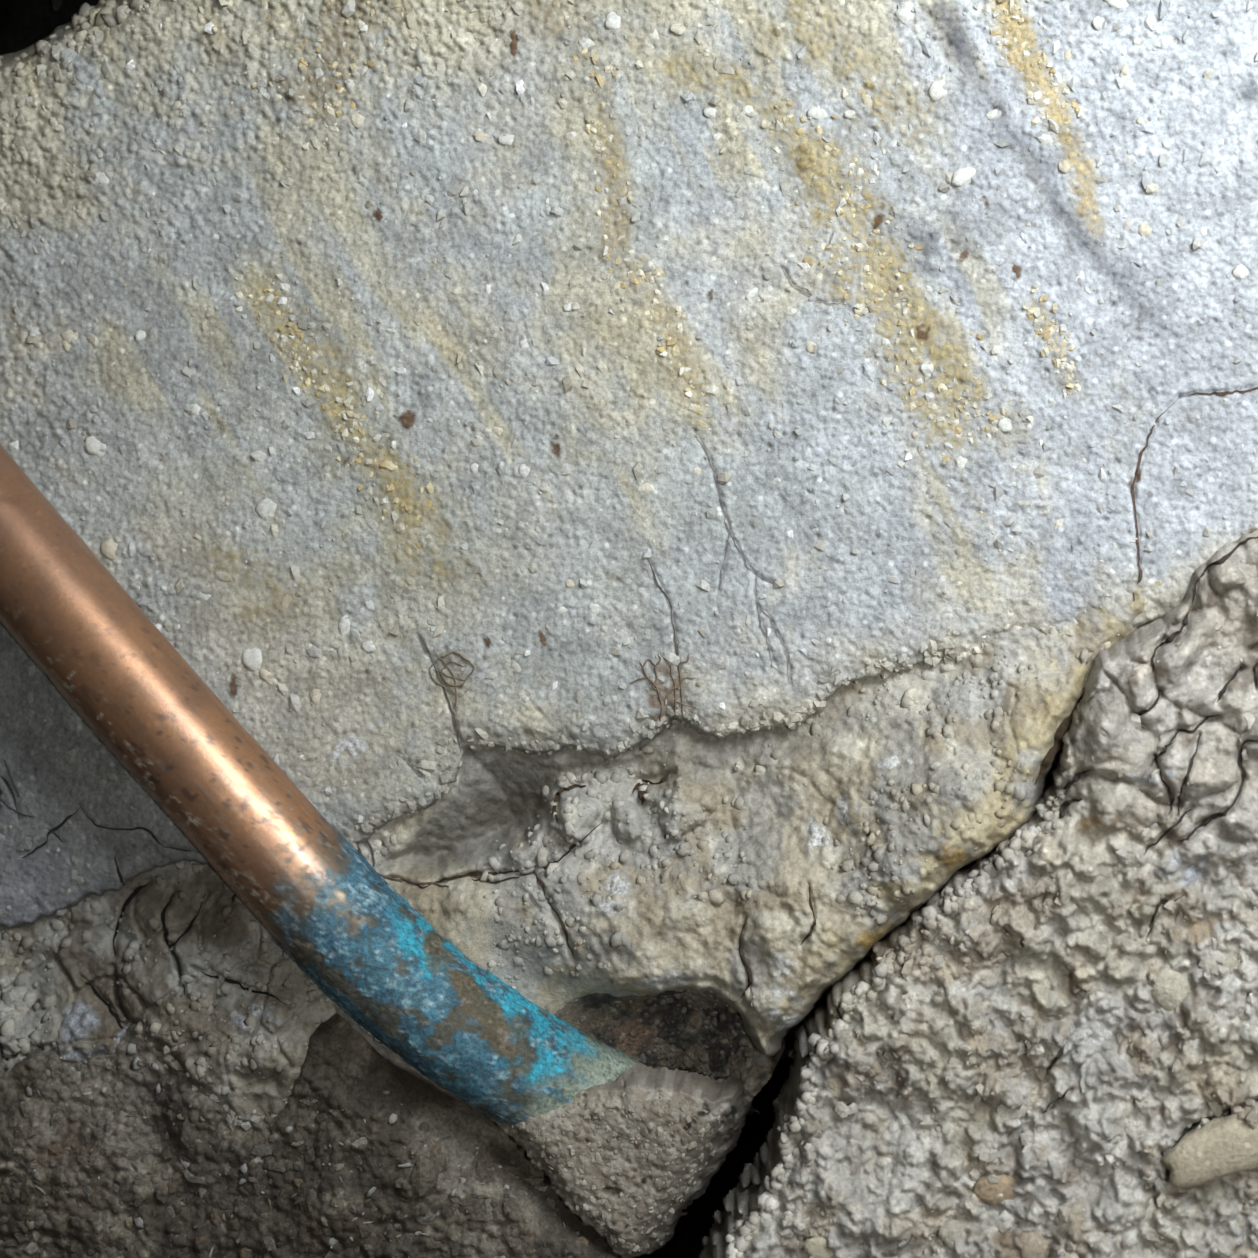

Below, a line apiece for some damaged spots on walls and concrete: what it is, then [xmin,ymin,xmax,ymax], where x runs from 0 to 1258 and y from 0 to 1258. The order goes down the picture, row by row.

crack [1131,387,1258,601]
crack [648,560,679,667]
crack [1138,537,1258,855]
crack [633,773,669,805]
crack [1034,694,1090,818]
crack [0,775,294,1030]
leakage [598,873,630,917]
crack [800,883,816,945]
leakage [623,972,695,995]
crack [739,917,753,999]
crack [1043,1028,1076,1113]